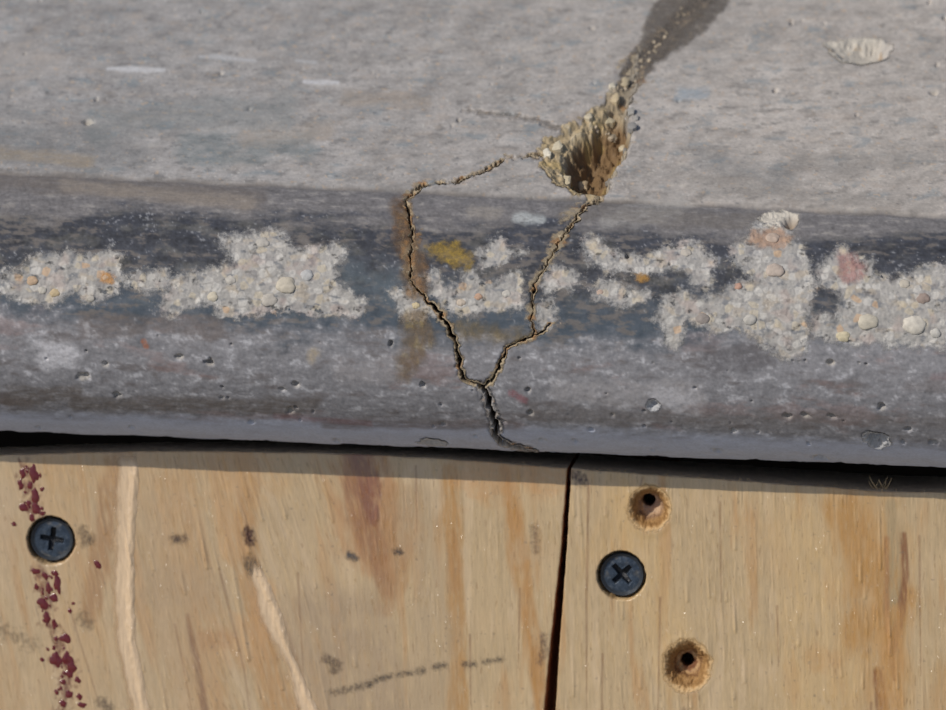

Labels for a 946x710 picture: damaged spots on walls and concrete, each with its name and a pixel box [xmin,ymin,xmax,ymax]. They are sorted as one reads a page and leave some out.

crack [617,53,644,115]
leakage [620,0,728,98]
spalling [0,226,367,321]
crack [402,150,604,453]
spalling [386,209,946,361]